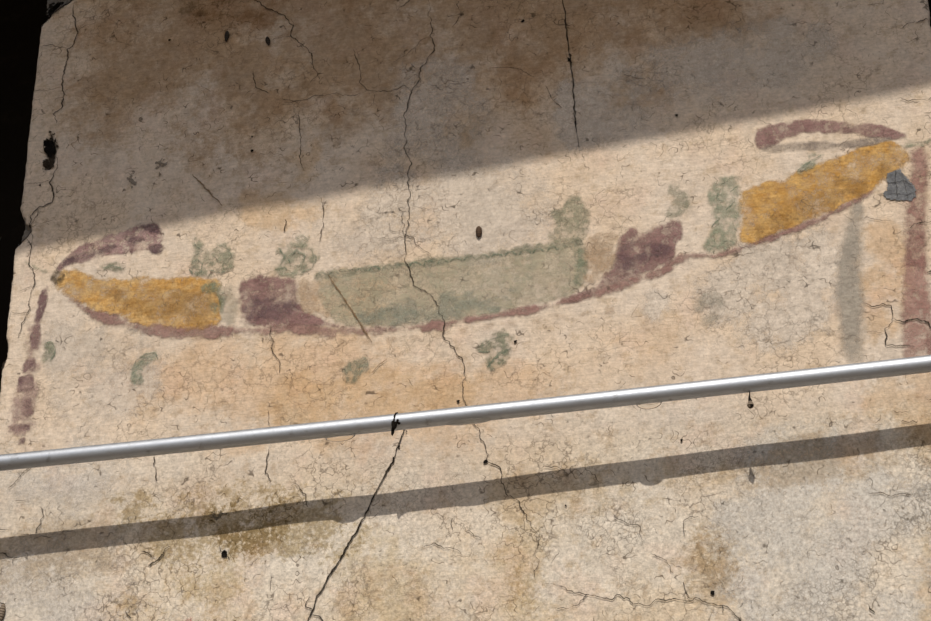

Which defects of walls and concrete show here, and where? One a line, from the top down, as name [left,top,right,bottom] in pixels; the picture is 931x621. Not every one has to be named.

crack [36,5,96,123]
crack [12,157,58,338]
crack [253,0,741,621]